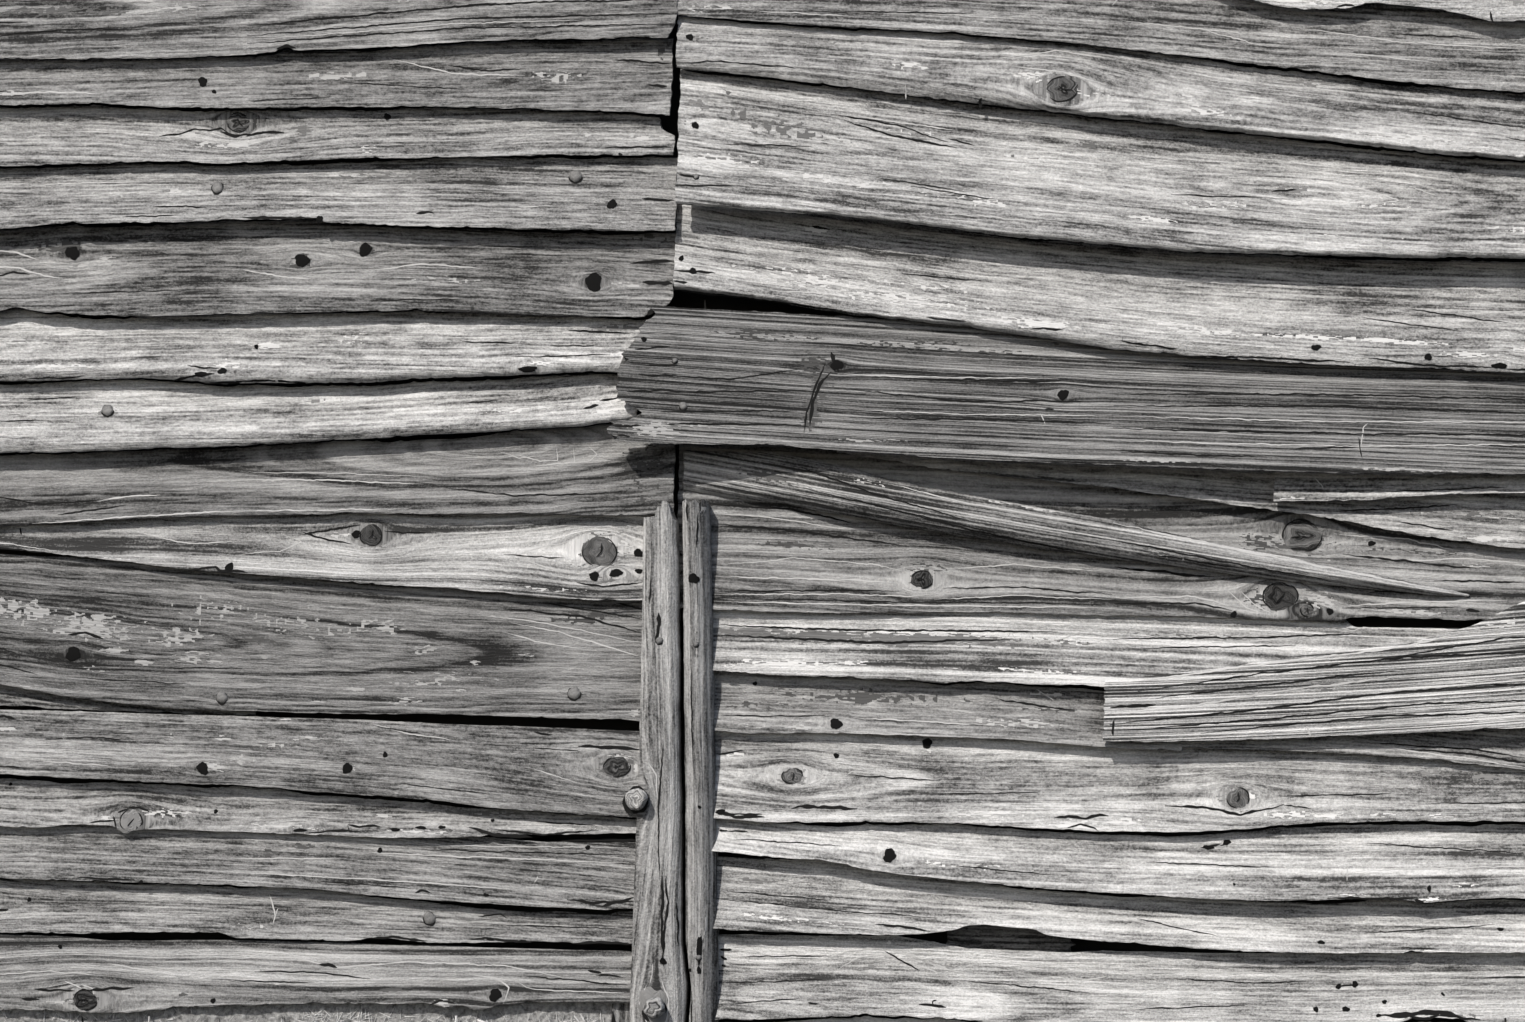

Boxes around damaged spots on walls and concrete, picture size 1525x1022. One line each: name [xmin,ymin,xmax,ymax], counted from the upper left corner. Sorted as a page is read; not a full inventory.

crack [374,295,455,303]
crack [462,259,1525,457]
crack [396,466,1525,1022]
crack [308,824,380,833]
crack [321,881,430,893]